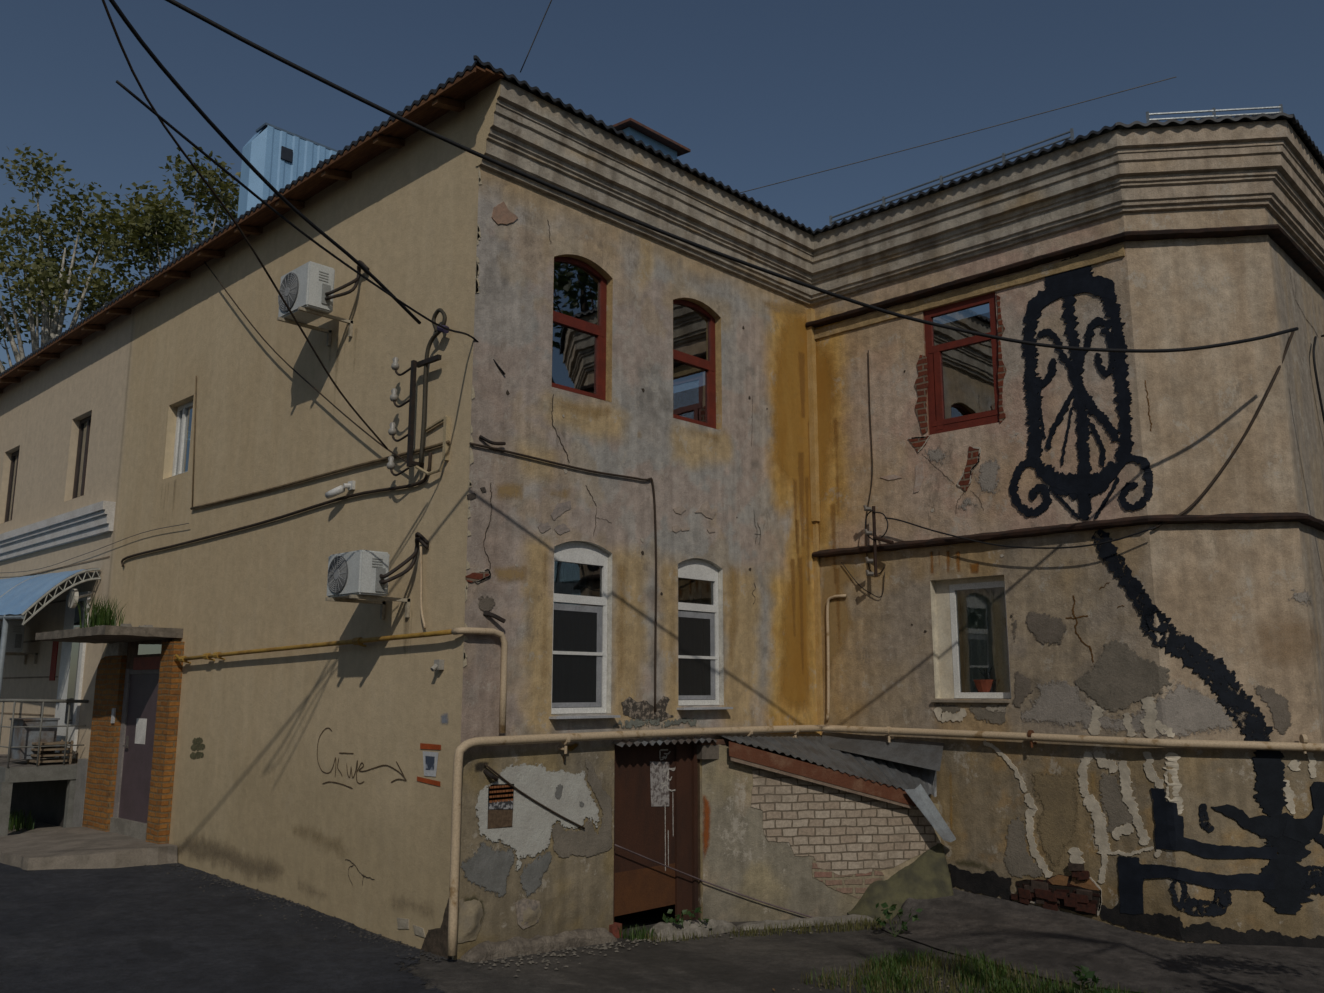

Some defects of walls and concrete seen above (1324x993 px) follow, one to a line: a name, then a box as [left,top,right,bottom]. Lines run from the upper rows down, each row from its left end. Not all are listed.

spalling [904,355,930,453]
water stain [776,318,855,705]
spalling [957,446,981,491]
peeling [475,763,600,871]